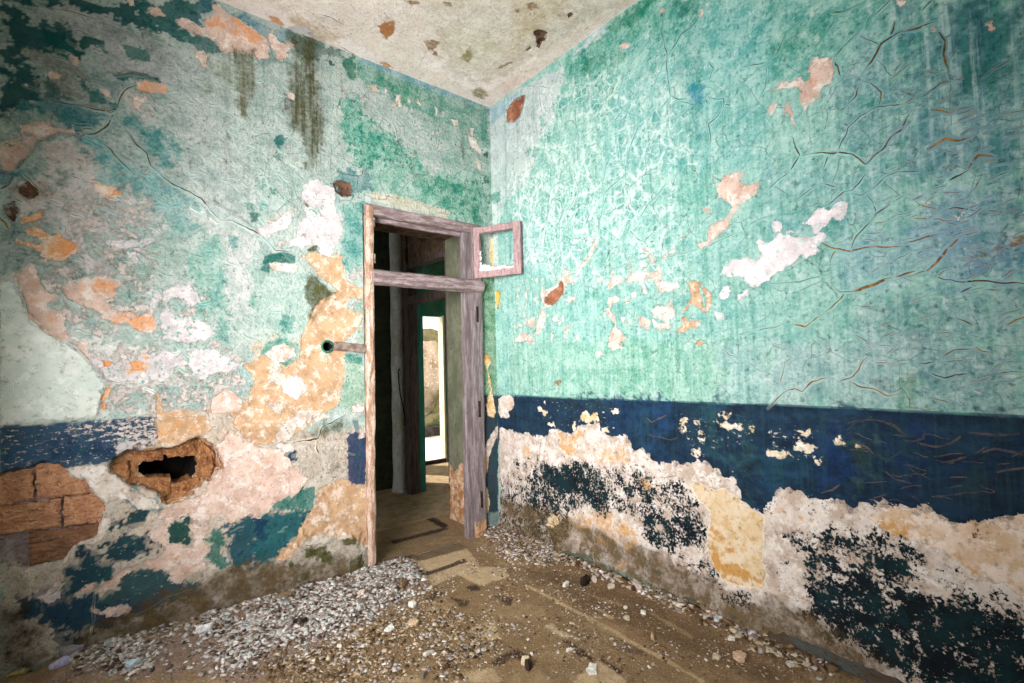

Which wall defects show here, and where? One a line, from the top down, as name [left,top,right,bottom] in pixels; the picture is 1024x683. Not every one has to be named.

crack [15,278,157,395]
crack [0,27,301,308]
peeling [0,178,368,604]
peeling [147,4,314,68]
leakage [233,50,254,116]
leakage [285,36,324,168]
crack [554,7,731,252]
crack [608,216,768,275]
peeling [595,201,848,358]
peeling [698,171,760,250]
crack [738,0,1024,502]
peeling [483,354,1024,683]